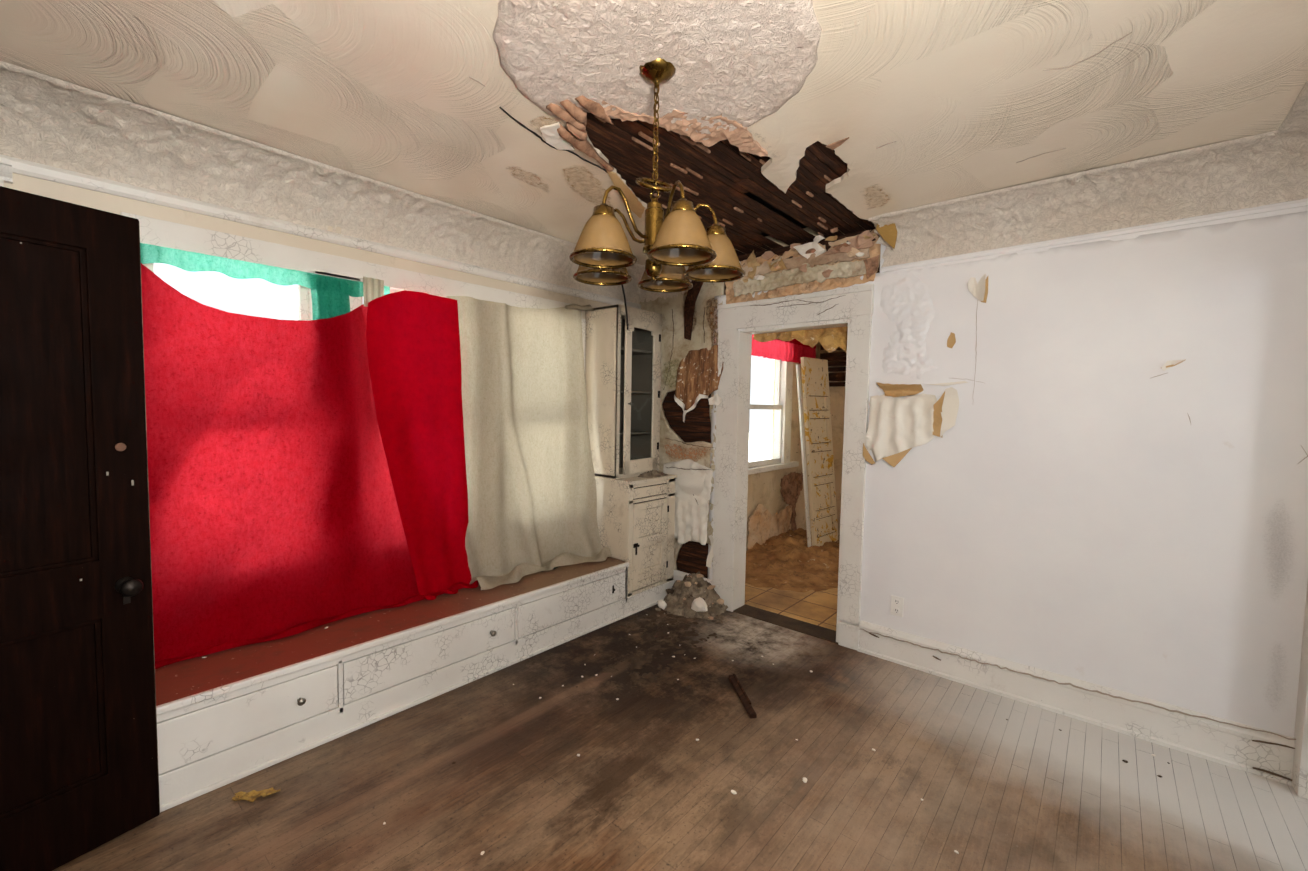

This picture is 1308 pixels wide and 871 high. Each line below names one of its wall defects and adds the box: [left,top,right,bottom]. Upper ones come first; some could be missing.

crack [469,77,607,173]
spalling [540,95,897,304]
peeling [662,345,724,443]
spalling [677,541,708,579]
crack [861,629,1296,781]